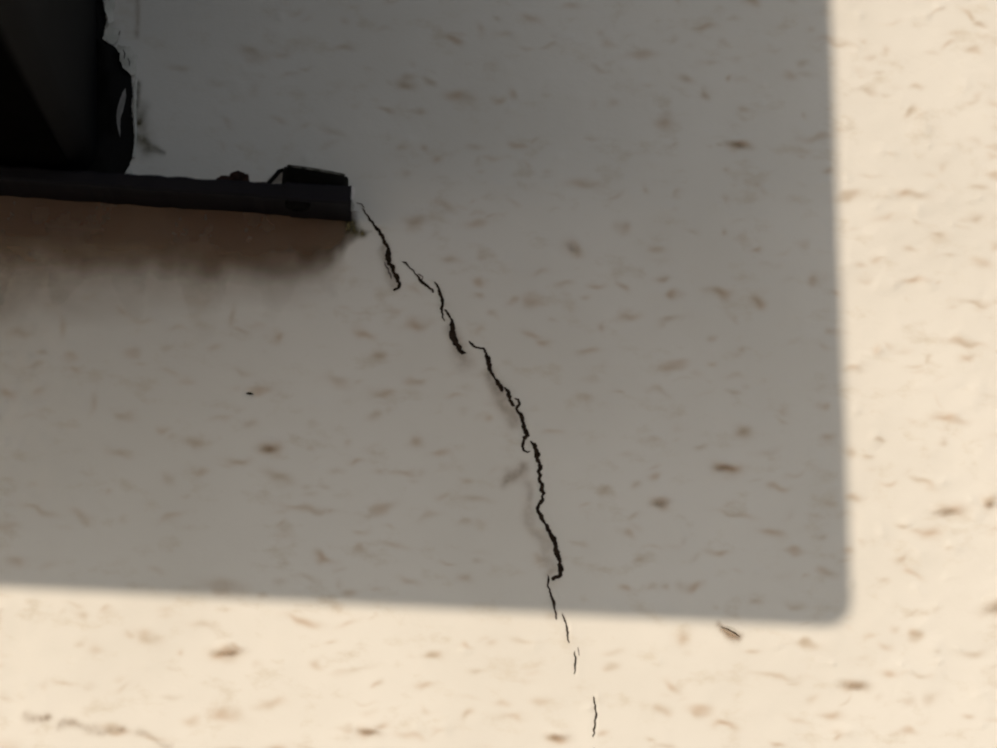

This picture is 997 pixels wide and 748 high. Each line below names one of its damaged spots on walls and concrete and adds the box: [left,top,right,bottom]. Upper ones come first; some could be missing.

crack [357,203,580,674]
crack [590,696,598,737]